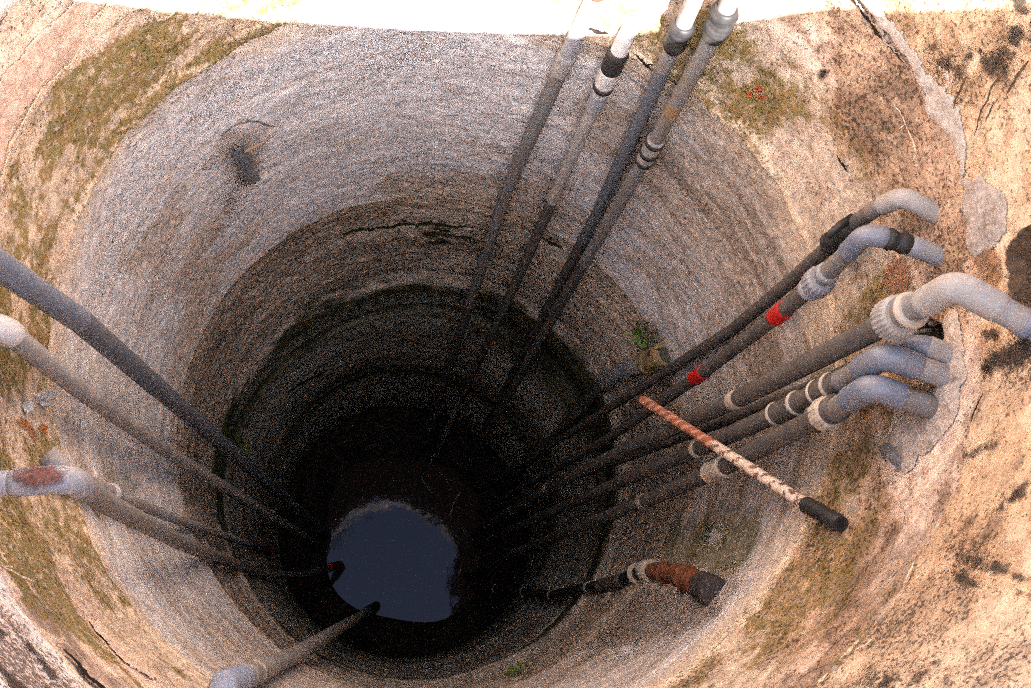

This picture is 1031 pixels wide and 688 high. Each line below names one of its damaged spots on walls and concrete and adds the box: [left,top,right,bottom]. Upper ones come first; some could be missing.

crack [851,0,909,69]
crack [337,221,487,236]
spalling [974,224,1031,308]
crack [63,649,106,688]